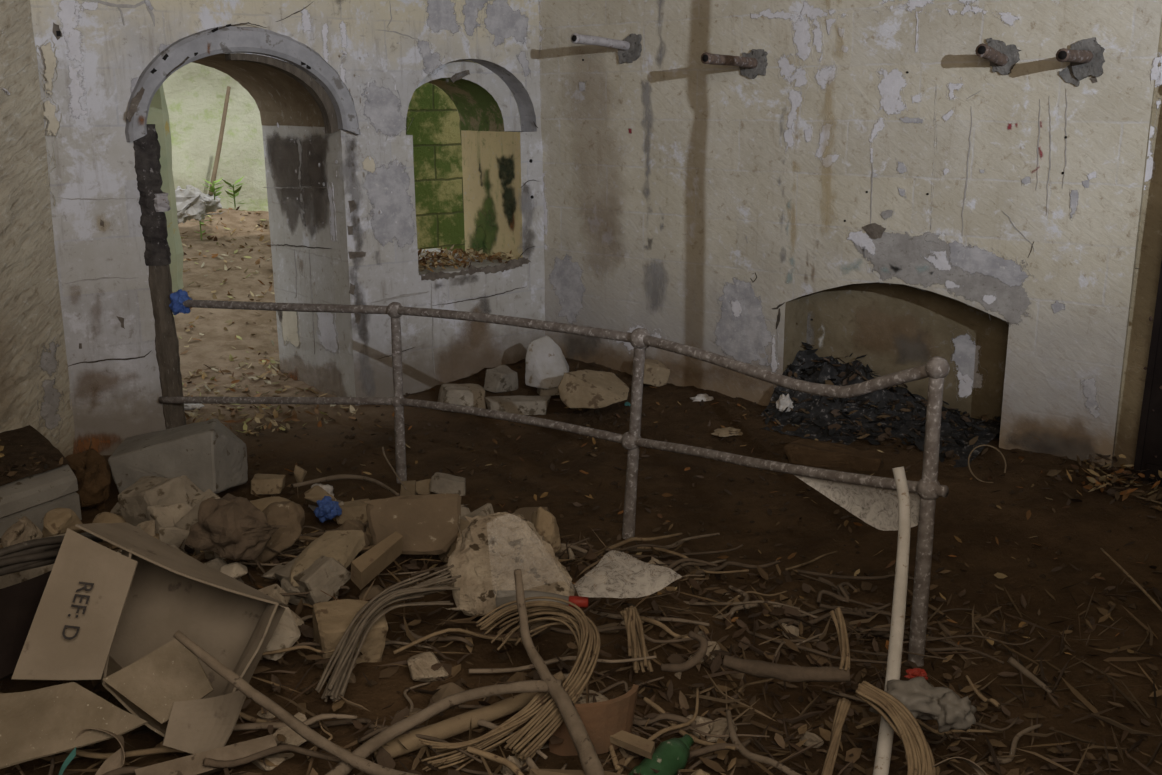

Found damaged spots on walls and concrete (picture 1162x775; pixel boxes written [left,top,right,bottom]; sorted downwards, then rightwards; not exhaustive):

crack [82,0,156,26]
flaking render [126,87,145,122]
peeling [300,8,369,96]
peeling [415,0,530,87]
peeling [750,0,1019,169]
peeling [319,160,356,242]
flaking render [843,67,1035,325]
flaking render [348,251,366,259]